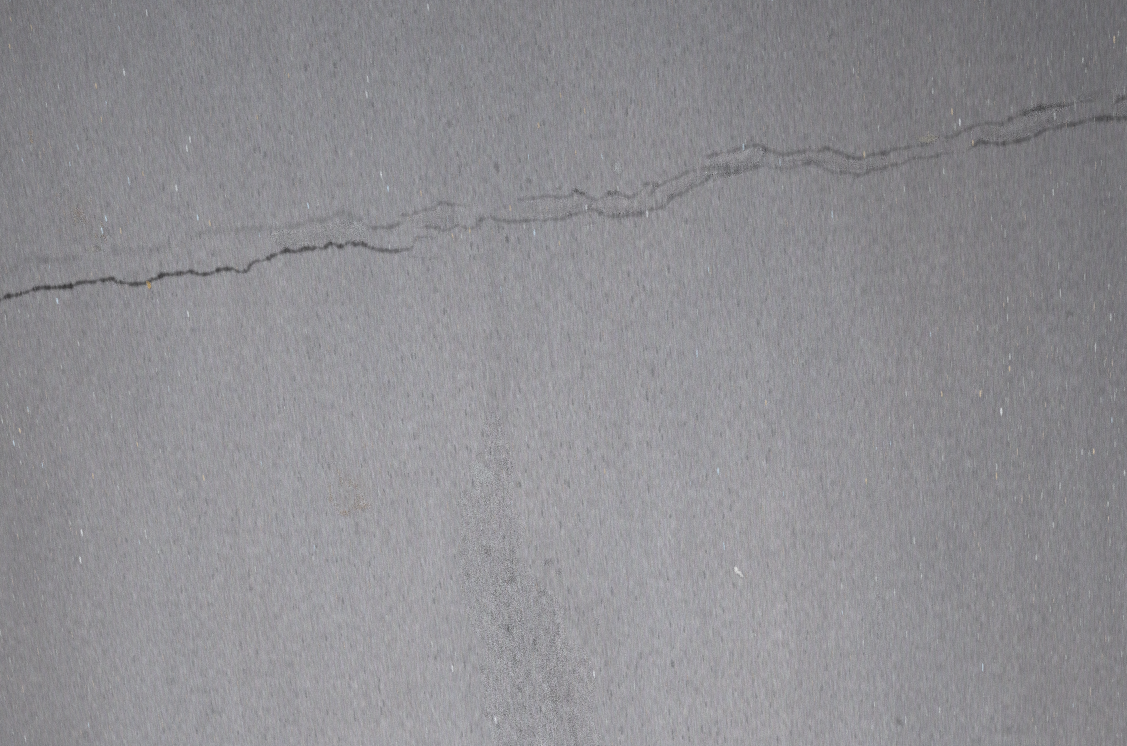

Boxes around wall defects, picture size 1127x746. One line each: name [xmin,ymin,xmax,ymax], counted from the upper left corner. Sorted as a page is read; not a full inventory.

crack [995,113,1051,136]
crack [716,151,751,163]
crack [607,199,638,208]
crack [4,242,366,299]